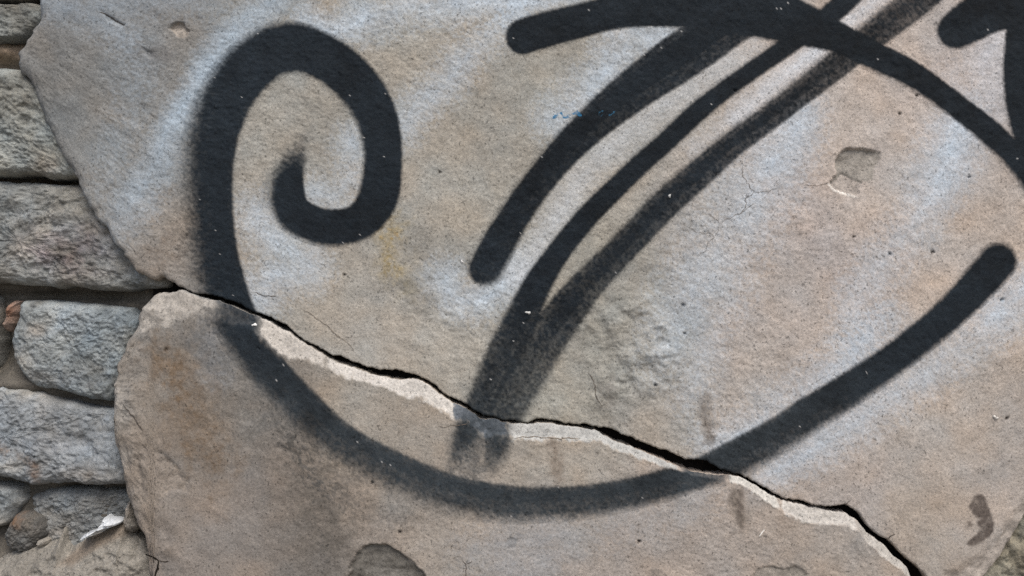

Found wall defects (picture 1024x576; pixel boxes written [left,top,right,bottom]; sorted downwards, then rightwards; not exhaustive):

spalling [827,146,882,200]
crack [153,283,922,576]